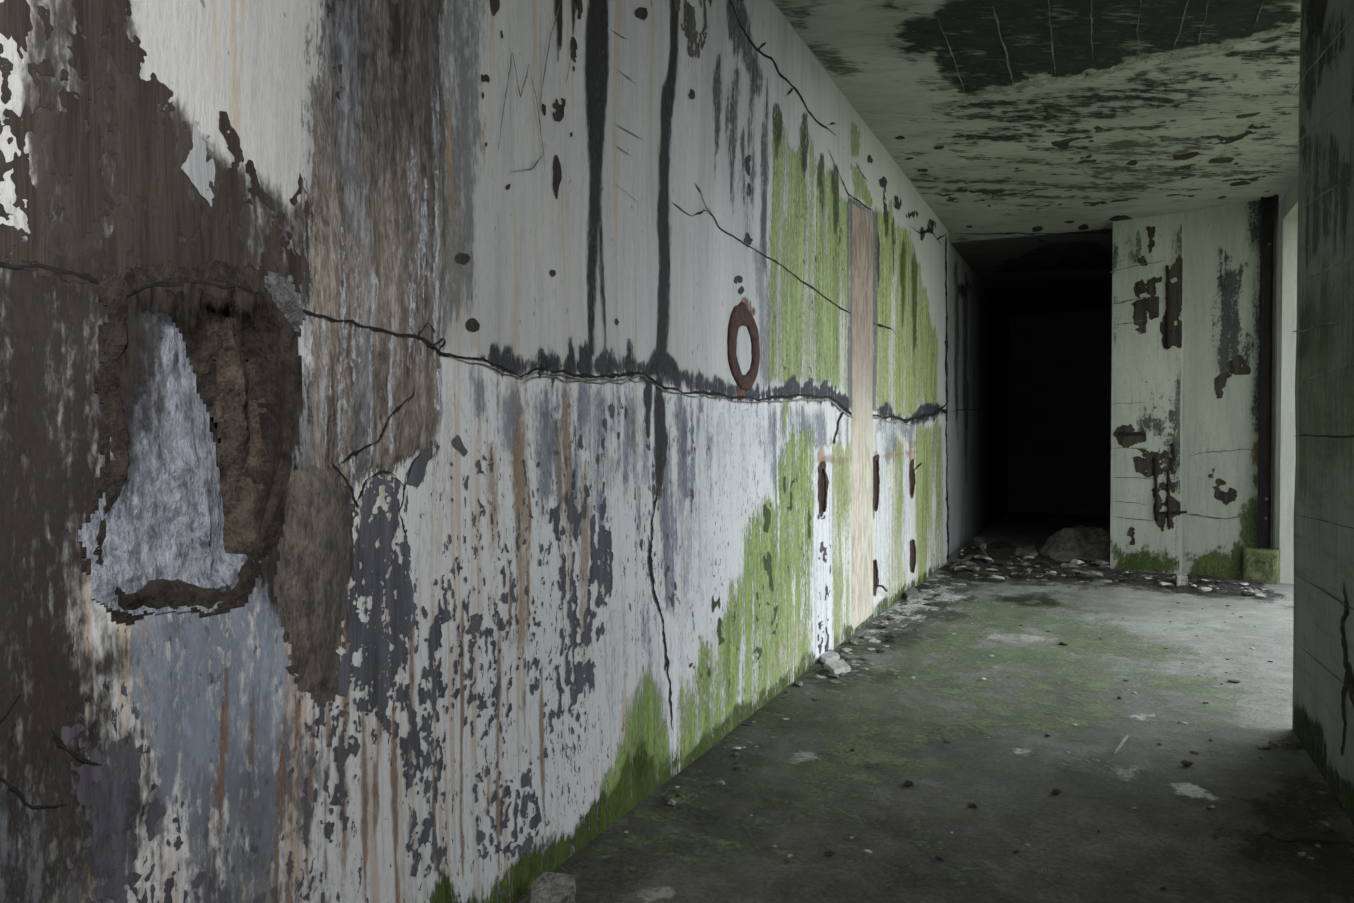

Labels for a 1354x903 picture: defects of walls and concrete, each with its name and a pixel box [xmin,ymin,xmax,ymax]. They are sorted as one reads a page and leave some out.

crack [0,262,98,283]
spalling [0,0,316,625]
crack [302,227,1112,560]
water stain [470,0,971,752]
corrosion [813,445,842,517]
corrosion [873,454,889,512]
spalling [1113,424,1181,532]
spalling [254,402,628,903]
crack [648,485,673,729]
corrosion [873,559,888,596]
water stain [988,634,1058,643]
water stain [641,887,674,901]